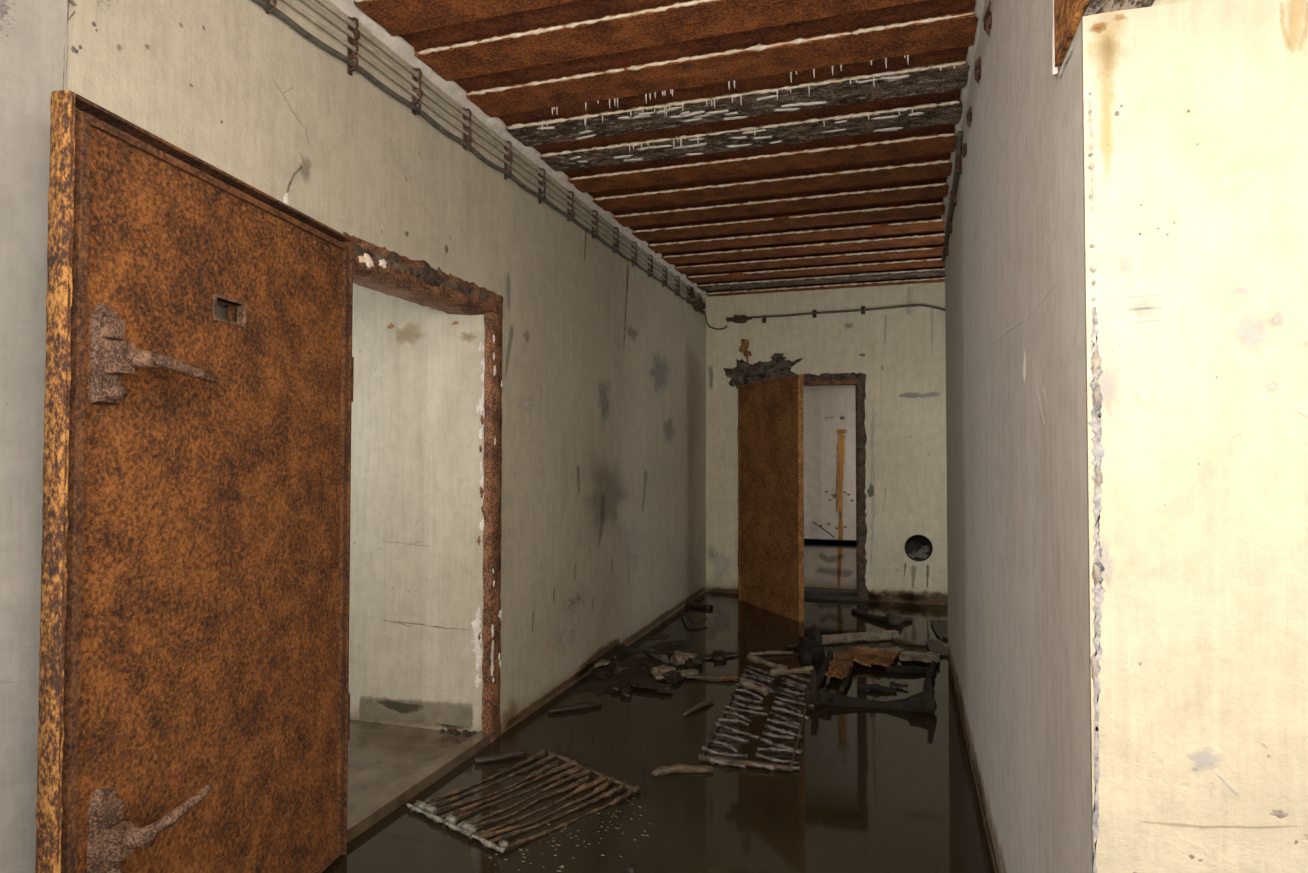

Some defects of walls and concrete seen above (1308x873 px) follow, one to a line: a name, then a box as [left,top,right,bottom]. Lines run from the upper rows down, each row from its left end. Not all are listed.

spalling [1087,92,1109,210]
spalling [709,353,803,388]
spalling [1089,267,1112,873]
leakage [948,649,1004,873]